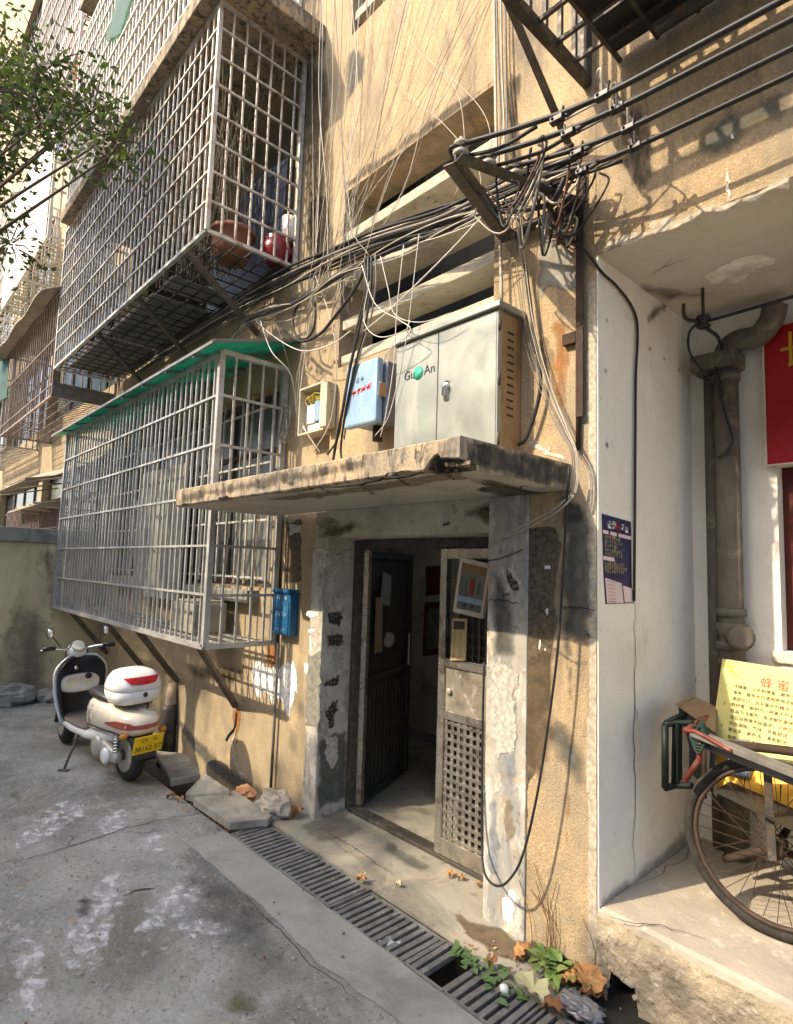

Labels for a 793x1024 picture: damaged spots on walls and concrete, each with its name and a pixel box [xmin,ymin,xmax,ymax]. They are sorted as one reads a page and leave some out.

peeling [704,254,778,285]
damp [182,460,363,502]
peeling [270,455,472,500]
peeling [304,611,339,769]
peeling [488,526,562,841]
damp [513,279,608,959]
crack [628,605,703,888]
peeling [502,889,516,924]